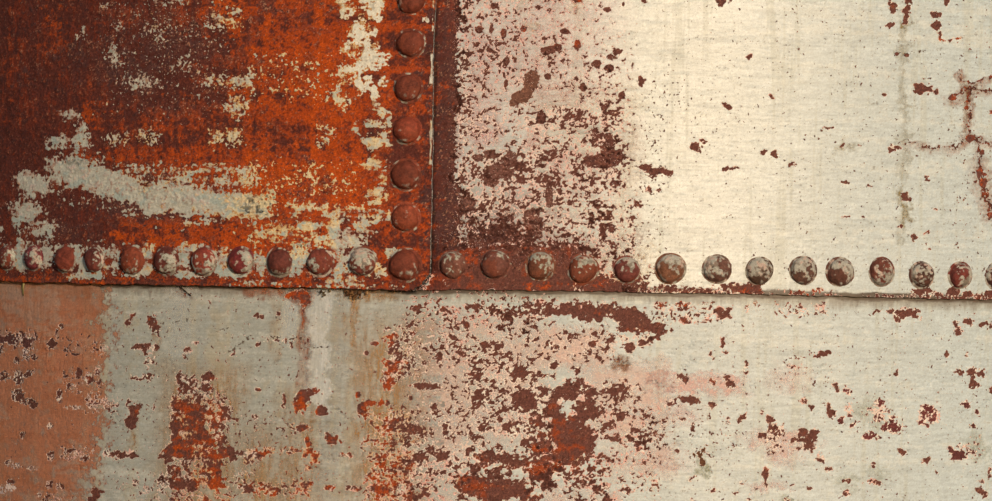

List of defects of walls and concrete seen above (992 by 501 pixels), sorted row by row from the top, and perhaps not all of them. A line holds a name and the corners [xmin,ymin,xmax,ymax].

peeling [0,0,674,501]
rust [255,287,312,360]
peeling [872,306,922,327]
rust [867,287,992,300]
peeling [952,317,992,336]
rust [0,323,120,416]
rust [46,445,94,462]
rust [106,324,421,501]
rust [440,357,680,501]
peeling [944,350,992,463]
peeling [975,467,992,499]